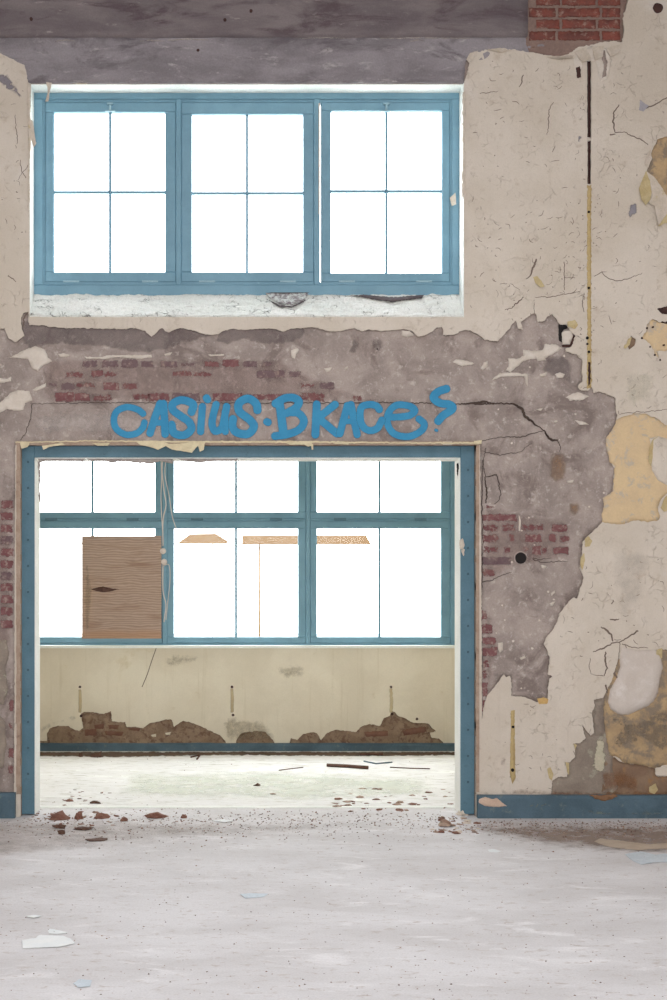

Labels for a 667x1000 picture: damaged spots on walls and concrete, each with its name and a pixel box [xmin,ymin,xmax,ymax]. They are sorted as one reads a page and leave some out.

flaking render [526,0,627,82]
peeling [639,137,667,226]
flaking render [0,306,667,801]
crack [457,400,561,638]
crack [589,600,647,693]
peeling [479,797,506,807]